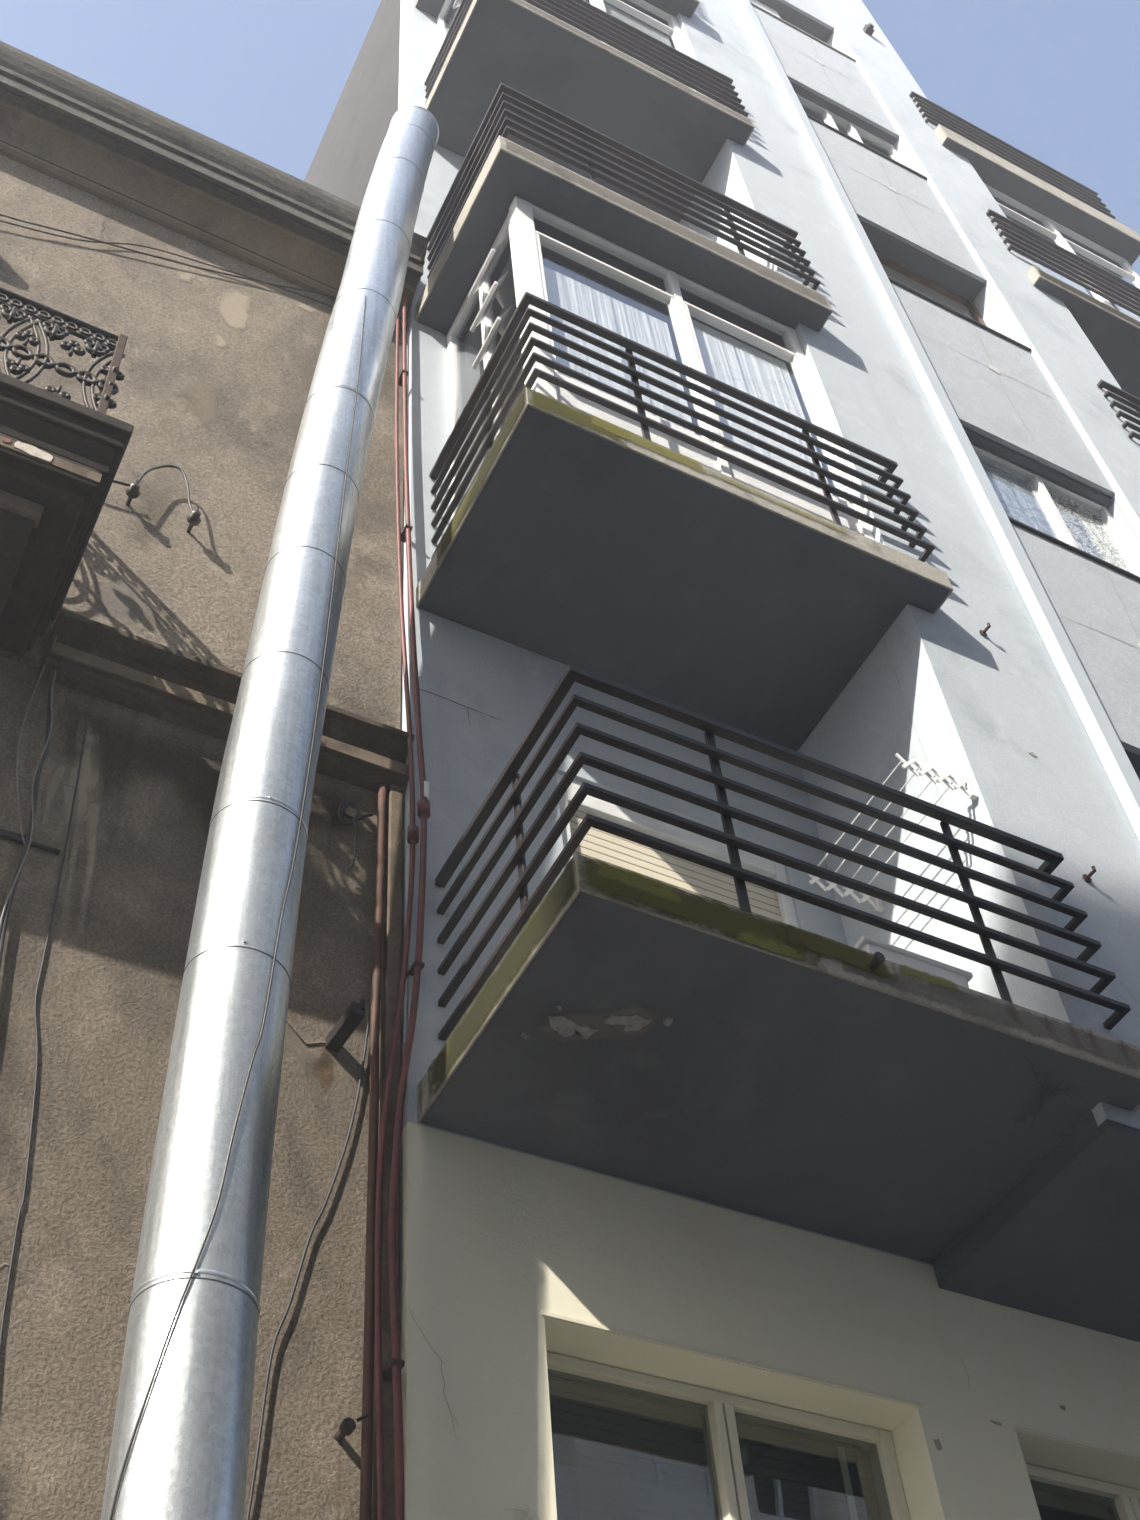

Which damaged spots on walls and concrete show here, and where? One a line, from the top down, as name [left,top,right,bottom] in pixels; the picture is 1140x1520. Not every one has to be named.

leakage [41,718,221,929]
leakage [310,795,354,825]
peeling [518,1004,673,1041]